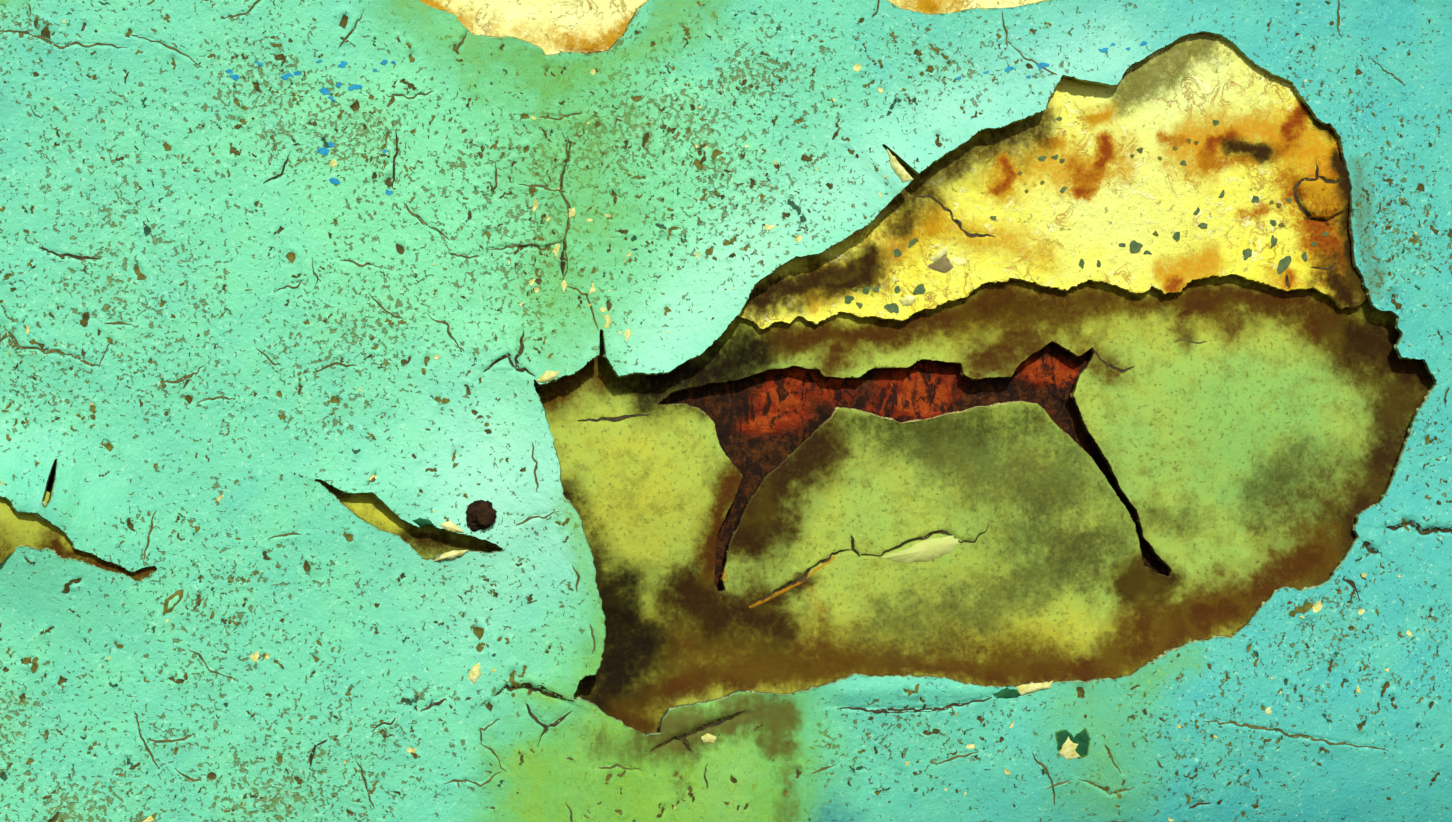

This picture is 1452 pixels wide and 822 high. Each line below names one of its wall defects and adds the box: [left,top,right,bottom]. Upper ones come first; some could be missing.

rust [421,0,472,30]
rust [531,20,629,53]
peeling [189,18,308,196]
crack [392,113,599,330]
peeling [0,305,113,441]
crack [274,258,535,376]
peeling [308,0,1452,822]
rust [526,33,1432,822]
peeling [0,490,74,565]
peeling [122,551,291,633]
crack [1343,520,1452,600]
crack [444,683,574,786]